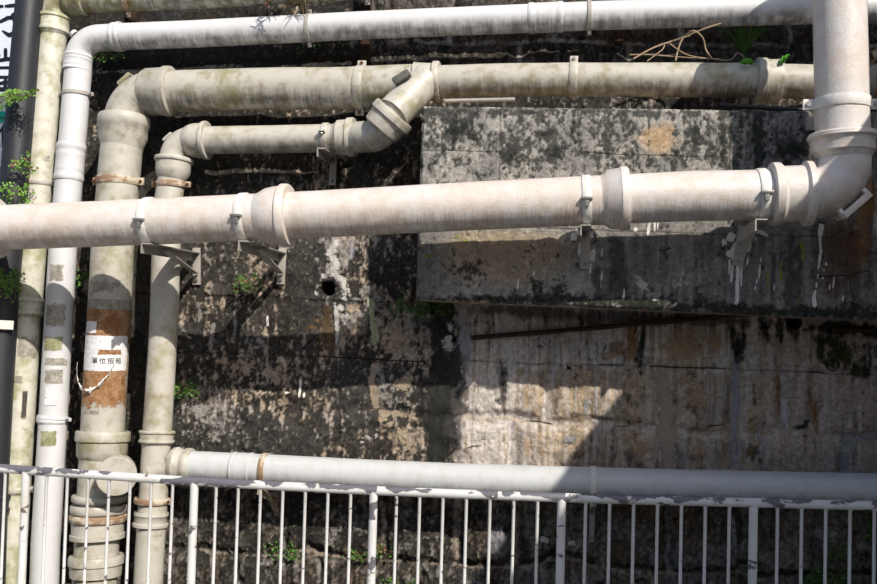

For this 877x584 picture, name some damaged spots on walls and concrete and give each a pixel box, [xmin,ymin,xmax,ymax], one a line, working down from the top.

water stain [441,118,479,150]
water stain [719,118,728,164]
water stain [748,116,807,164]
water stain [424,233,877,464]